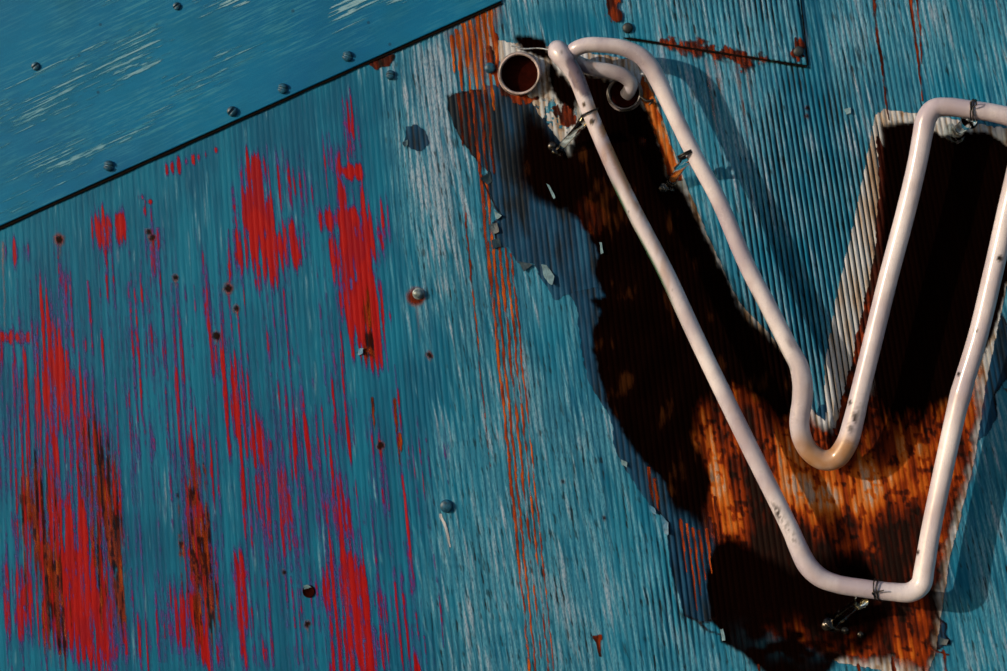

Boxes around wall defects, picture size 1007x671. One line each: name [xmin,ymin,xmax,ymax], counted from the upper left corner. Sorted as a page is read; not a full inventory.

rust [78,414,126,632]
peeling [0,88,431,671]
rust [449,9,554,671]
peeling [447,35,722,622]
rust [678,398,799,608]
rust [730,386,948,583]
rust [809,136,884,450]
peeling [810,109,917,430]
rust [843,379,980,671]
peeling [835,283,1007,671]
peeling [934,117,959,136]
peeling [967,124,1007,146]